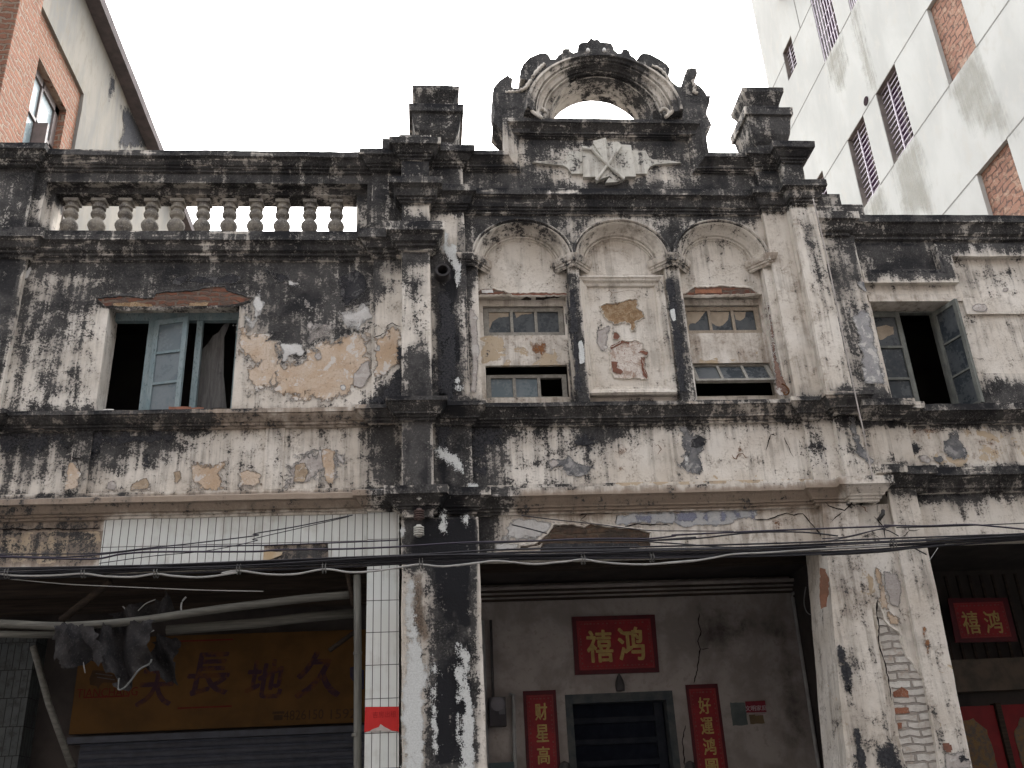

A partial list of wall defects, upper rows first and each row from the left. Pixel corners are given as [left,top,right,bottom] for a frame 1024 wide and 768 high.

flaking render [95,264,402,403]
water stain [435,290,458,401]
flaking render [596,299,649,381]
flaking render [284,448,348,489]
water stain [434,425,452,458]
flaking render [677,426,707,479]
flaking render [495,510,758,553]
crack [756,492,920,538]
water stain [414,574,429,640]
flaking render [819,568,829,609]
crack [694,614,708,682]
flaking render [872,567,972,768]